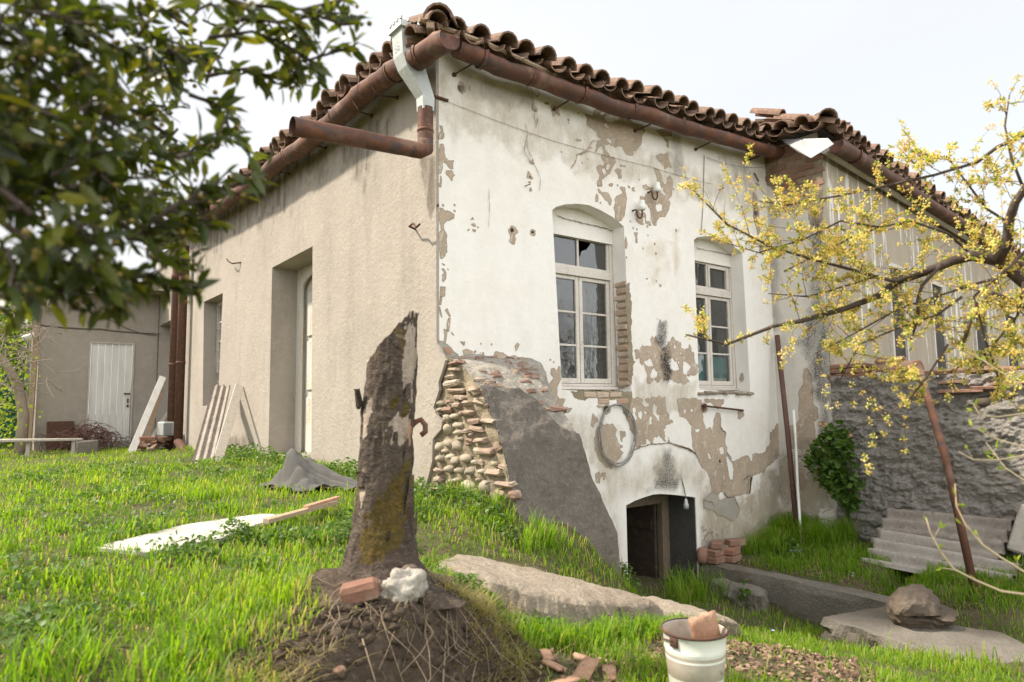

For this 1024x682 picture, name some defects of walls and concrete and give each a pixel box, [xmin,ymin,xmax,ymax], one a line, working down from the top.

peeling [438,125,455,187]
peeling [438,204,520,359]
spalling [508,225,536,245]
peeling [544,102,674,259]
damp [661,351,672,381]
peeling [549,281,819,498]